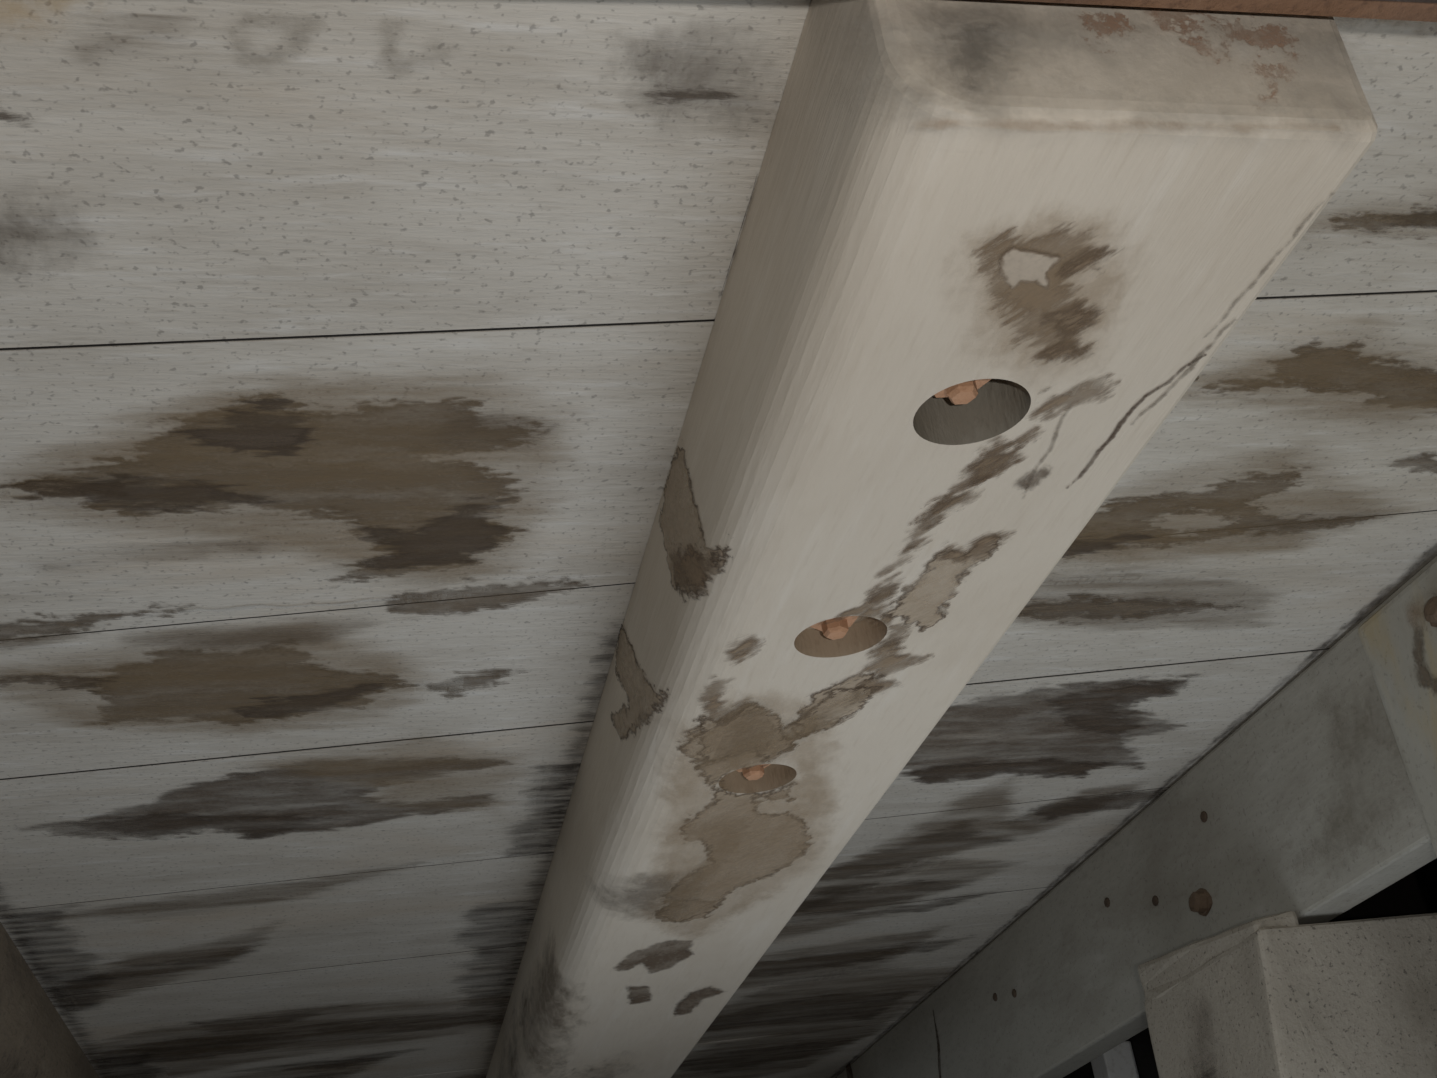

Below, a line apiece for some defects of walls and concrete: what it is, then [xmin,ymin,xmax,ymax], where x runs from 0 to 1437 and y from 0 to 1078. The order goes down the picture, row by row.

leakage [1329,195,1437,243]
crack [1078,345,1212,479]
leakage [1194,338,1437,409]
leakage [0,394,590,615]
leakage [1062,467,1383,563]
leakage [0,605,297,642]
leakage [1017,576,1241,625]
leakage [0,630,529,730]
leakage [52,758,512,840]
leakage [778,676,1188,936]